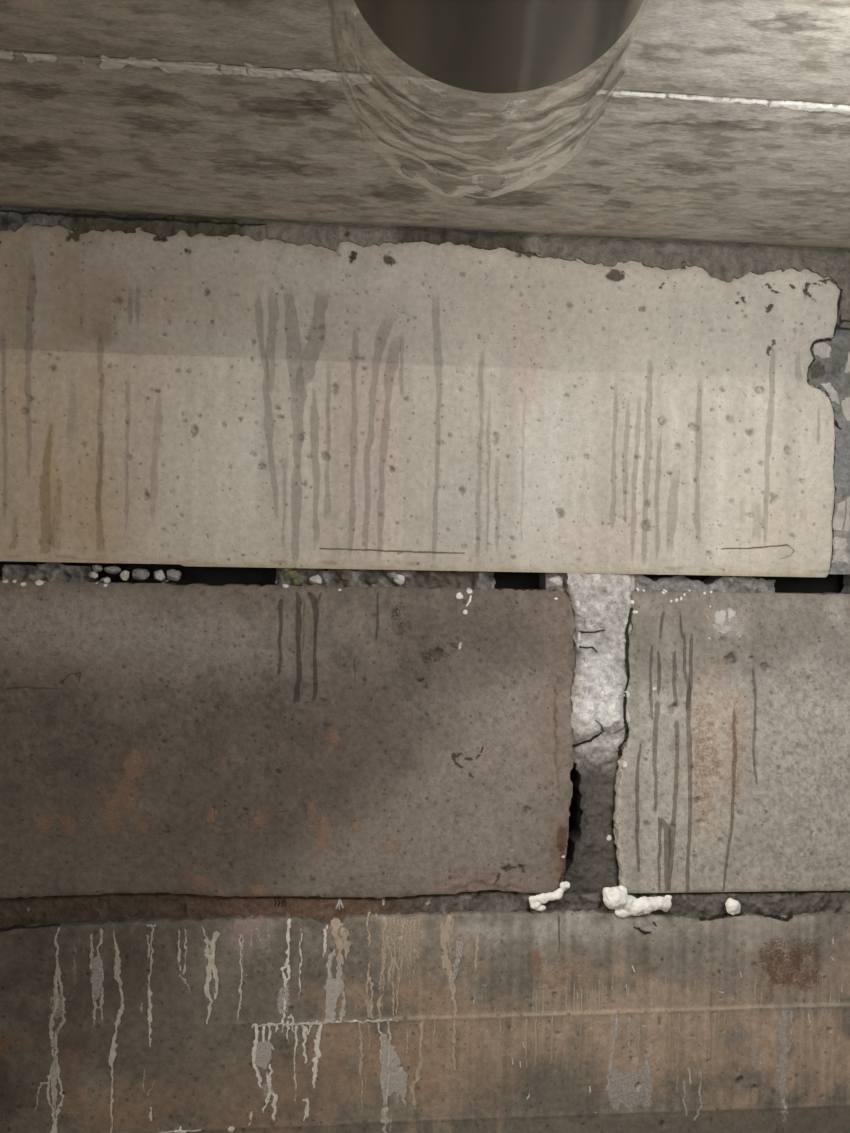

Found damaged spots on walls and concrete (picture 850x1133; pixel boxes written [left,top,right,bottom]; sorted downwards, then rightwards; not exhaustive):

spalling [807,339,839,404]
crack [572,608,633,756]
water stain [37,927,124,1133]
water stain [141,924,156,1047]
water stain [177,929,189,986]
water stain [202,926,220,1024]
water stain [233,917,270,1019]
water stain [248,911,479,1133]